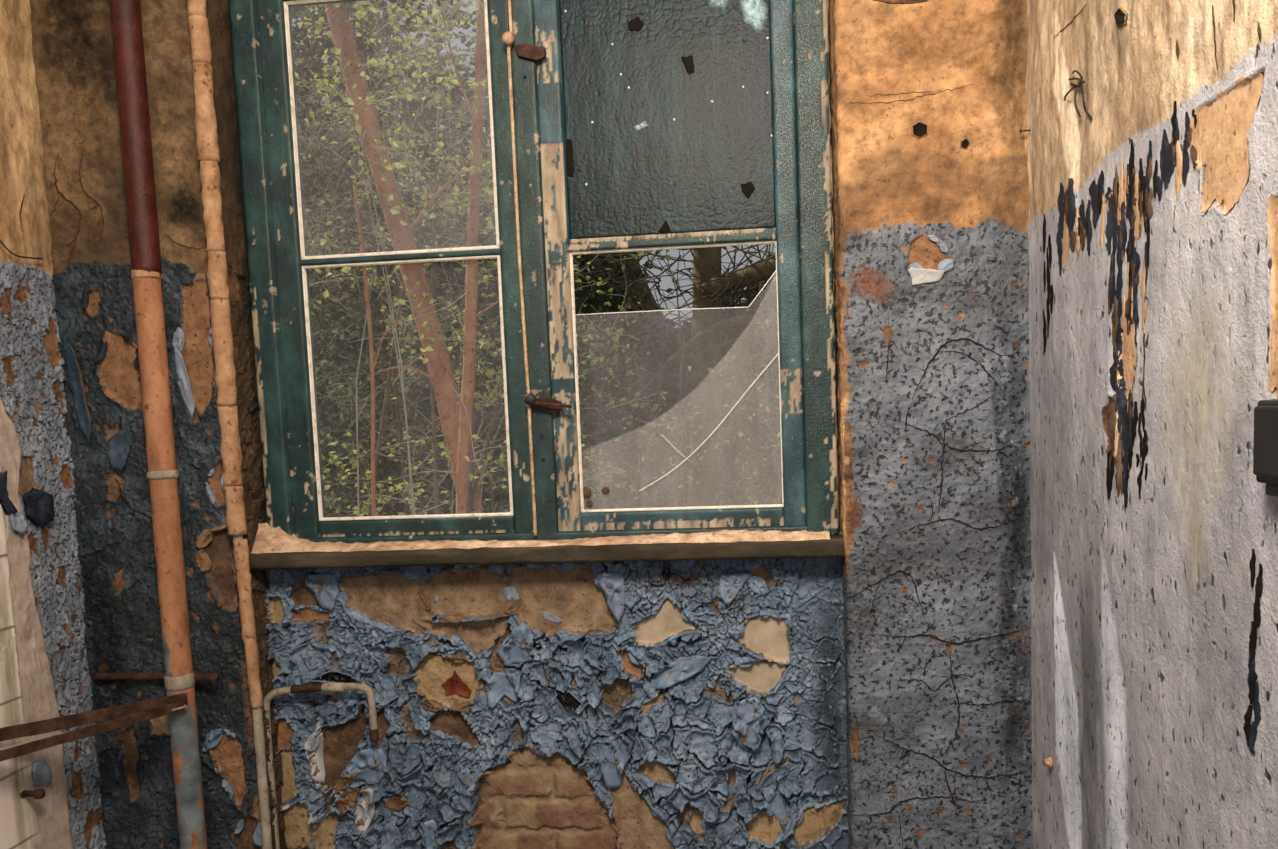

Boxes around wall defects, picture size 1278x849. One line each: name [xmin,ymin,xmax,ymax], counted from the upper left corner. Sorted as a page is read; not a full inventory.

water stain [47,0,104,79]
crack [19,153,104,276]
flaking render [908,233,954,285]
peeling [1042,73,1263,508]
peeling [0,446,75,535]
crack [886,317,1020,530]
flaking render [275,700,410,849]
flaking render [267,562,711,750]
flaking render [458,735,712,849]
flaking render [724,610,797,749]
crack [851,570,1022,849]
peeling [1243,549,1263,753]